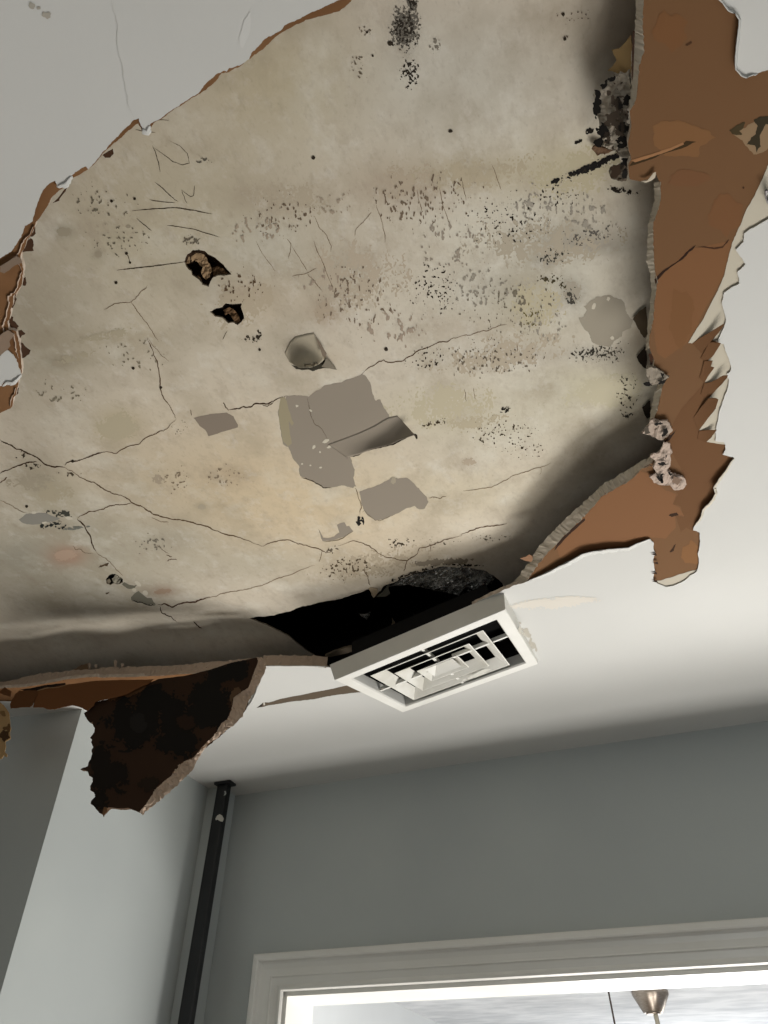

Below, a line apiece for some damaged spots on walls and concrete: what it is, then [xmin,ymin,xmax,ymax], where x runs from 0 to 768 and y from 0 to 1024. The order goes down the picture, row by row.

mould [387,0,441,90]
spalling [591,0,644,181]
water stain [77,186,150,264]
water stain [200,266,275,351]
water stain [232,180,350,243]
peeling [285,333,337,371]
water stain [298,127,646,458]
peeling [579,182,661,368]
crack [0,288,518,628]
peeling [278,374,428,520]
crack [431,466,544,499]
spalling [514,457,651,583]